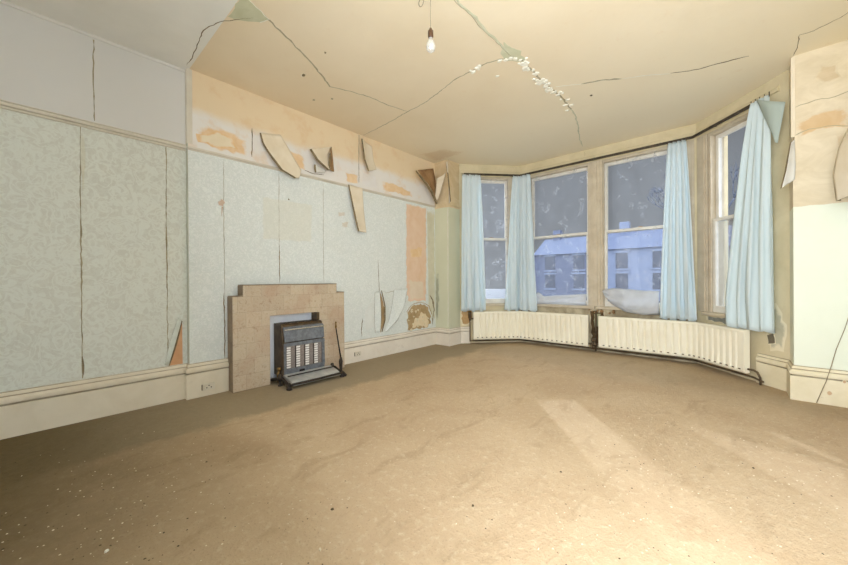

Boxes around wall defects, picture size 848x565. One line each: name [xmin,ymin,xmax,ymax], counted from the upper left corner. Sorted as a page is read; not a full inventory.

peeling [227,0,270,23]
crack [268,0,747,147]
peeling [344,171,435,332]
peeling [165,318,183,366]